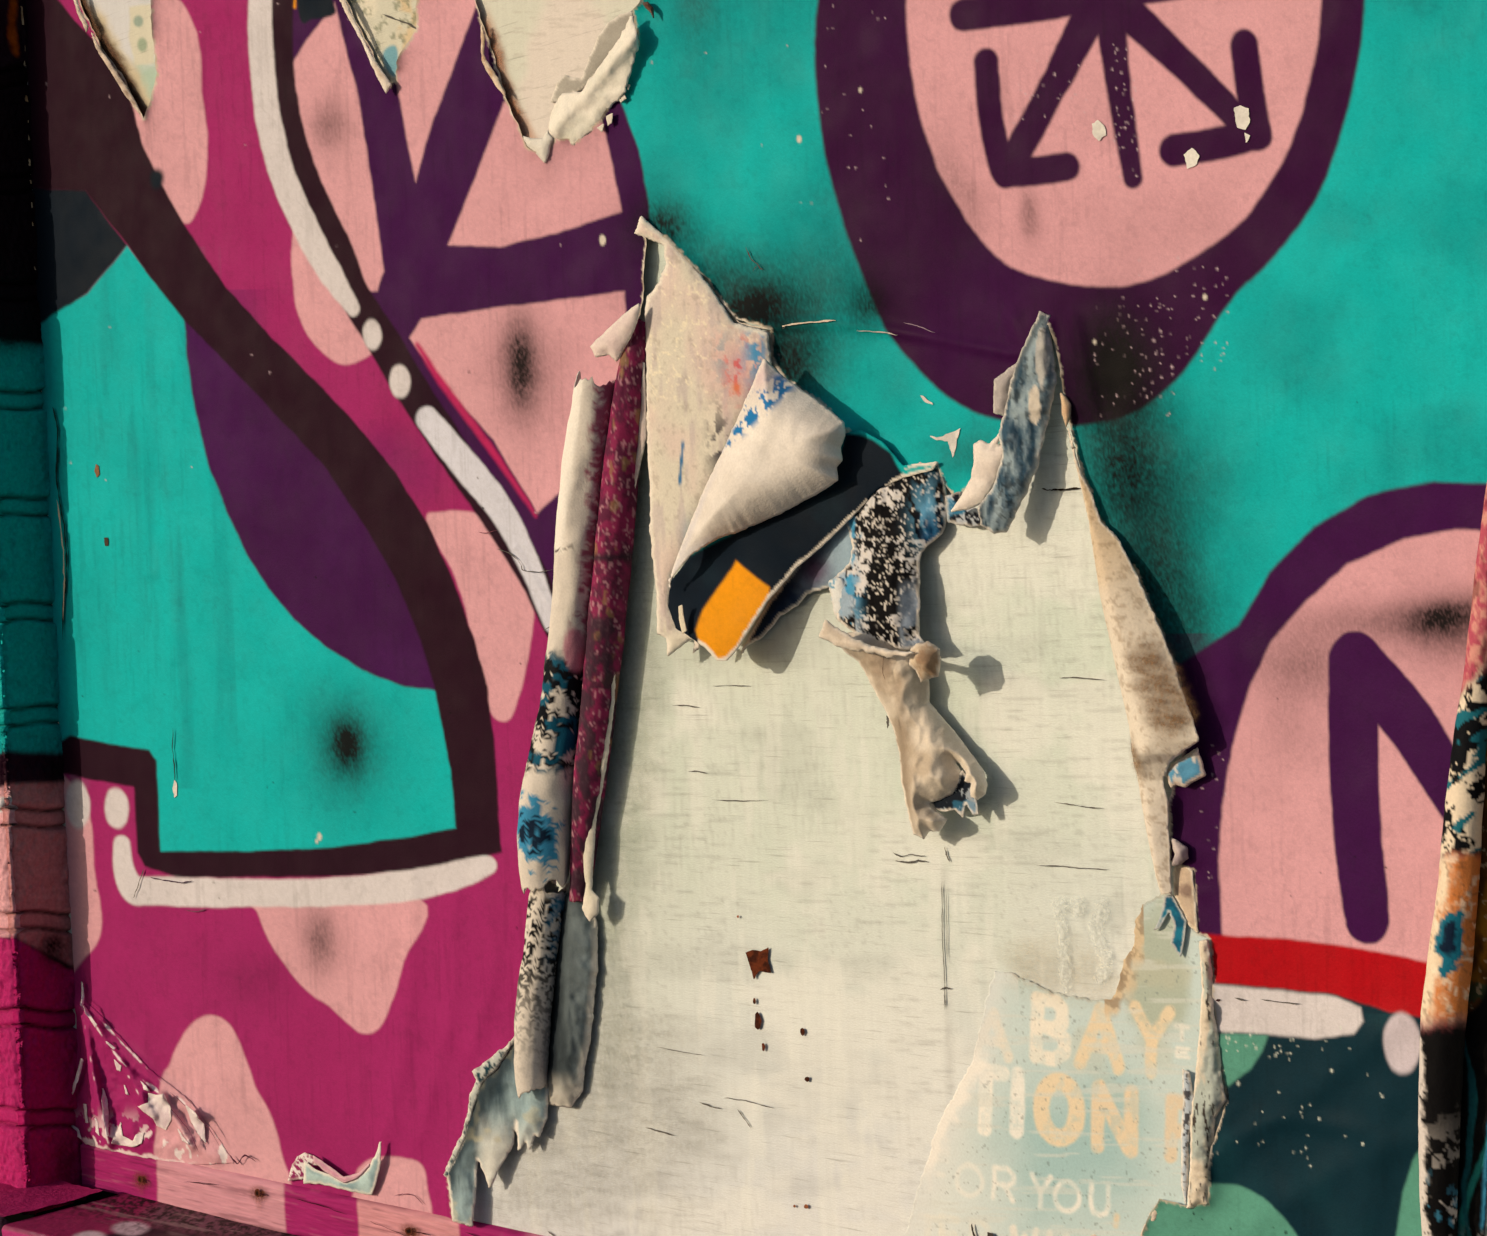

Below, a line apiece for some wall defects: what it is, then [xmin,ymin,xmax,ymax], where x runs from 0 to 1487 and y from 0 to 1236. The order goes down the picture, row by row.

peeling [930,428,960,457]